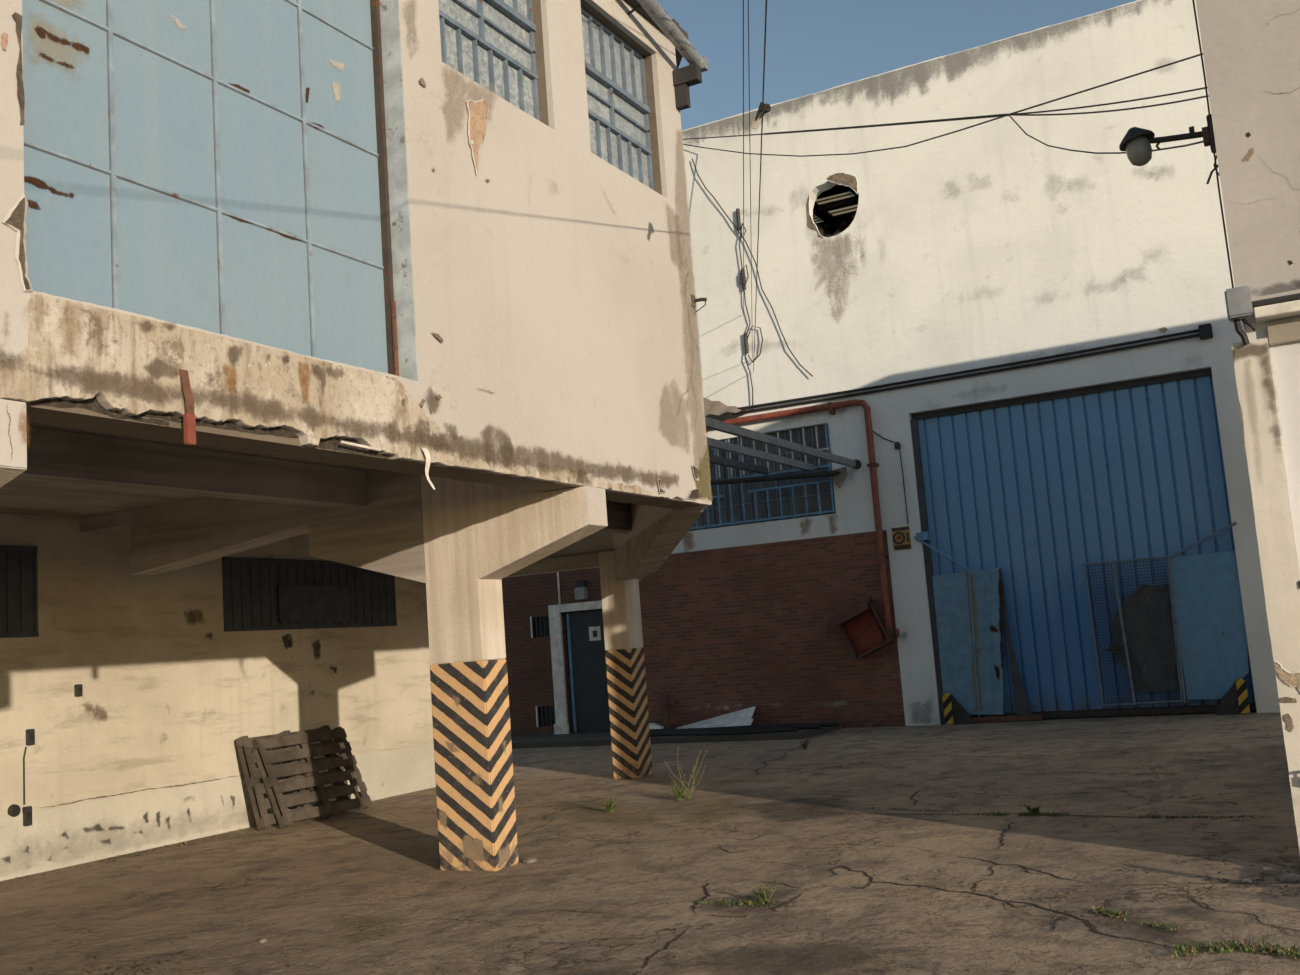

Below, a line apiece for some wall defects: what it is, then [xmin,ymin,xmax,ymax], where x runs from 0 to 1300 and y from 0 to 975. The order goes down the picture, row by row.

flaking render [1,12,25,124]
corrosion [35,26,90,68]
corrosion [24,176,74,209]
flaking render [2,193,33,292]
leakage [146,359,176,378]
leakage [230,346,241,363]
leakage [312,365,343,388]
spalling [4,396,299,438]
spalling [1274,661,1300,732]
crack [958,856,1077,881]
crack [819,860,1169,947]
crack [642,883,711,968]